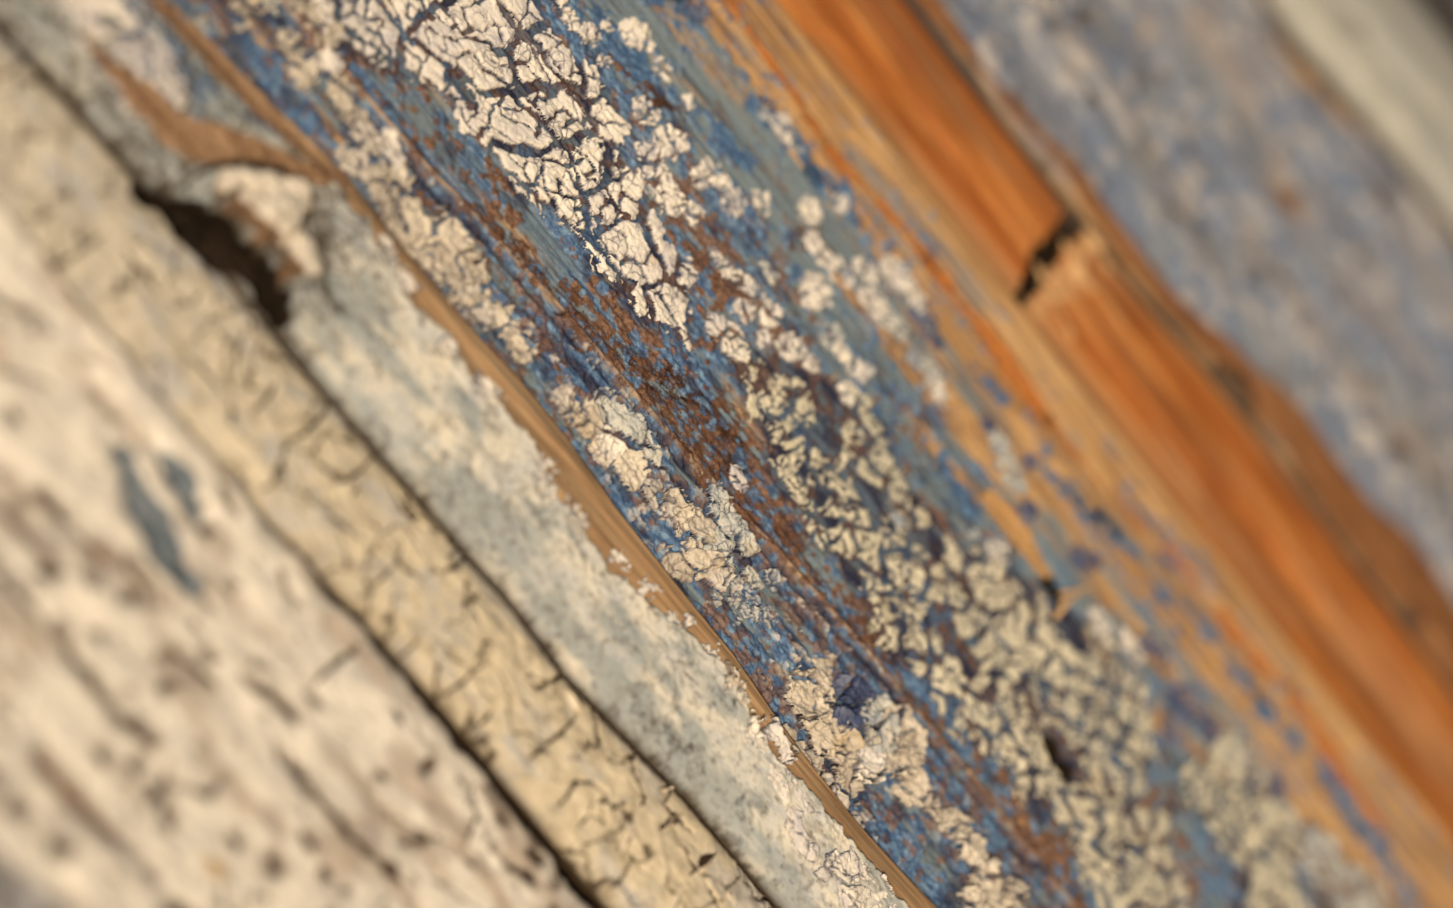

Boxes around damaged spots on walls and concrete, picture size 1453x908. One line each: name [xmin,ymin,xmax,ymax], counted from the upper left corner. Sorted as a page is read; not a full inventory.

peeling [756,95,805,156]
peeling [46,0,771,367]
crack [1013,229,1081,307]
peeling [471,370,507,406]
crack [0,30,774,908]
peeling [530,449,590,533]
peeling [546,384,803,633]
peeling [700,192,1310,908]
peeling [63,644,160,749]
peeling [32,747,129,855]
peeling [289,765,400,881]
peeling [507,848,544,884]